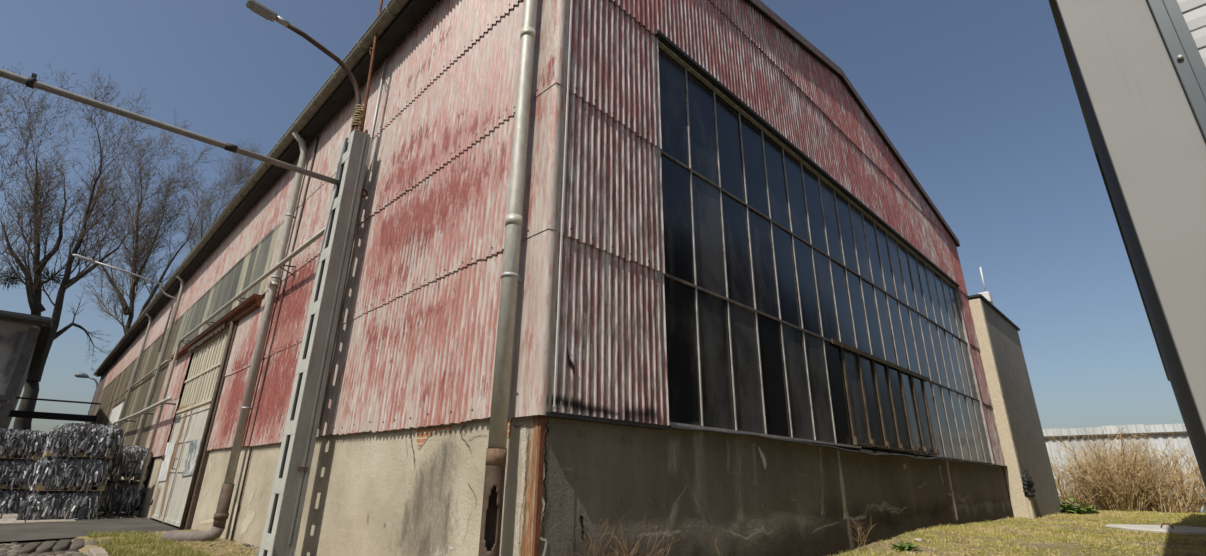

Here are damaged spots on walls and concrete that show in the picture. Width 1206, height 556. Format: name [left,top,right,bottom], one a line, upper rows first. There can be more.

water stain [402,444,455,556]
spalling [415,426,454,449]
corrosion [521,415,539,556]
water stain [756,448,1012,556]